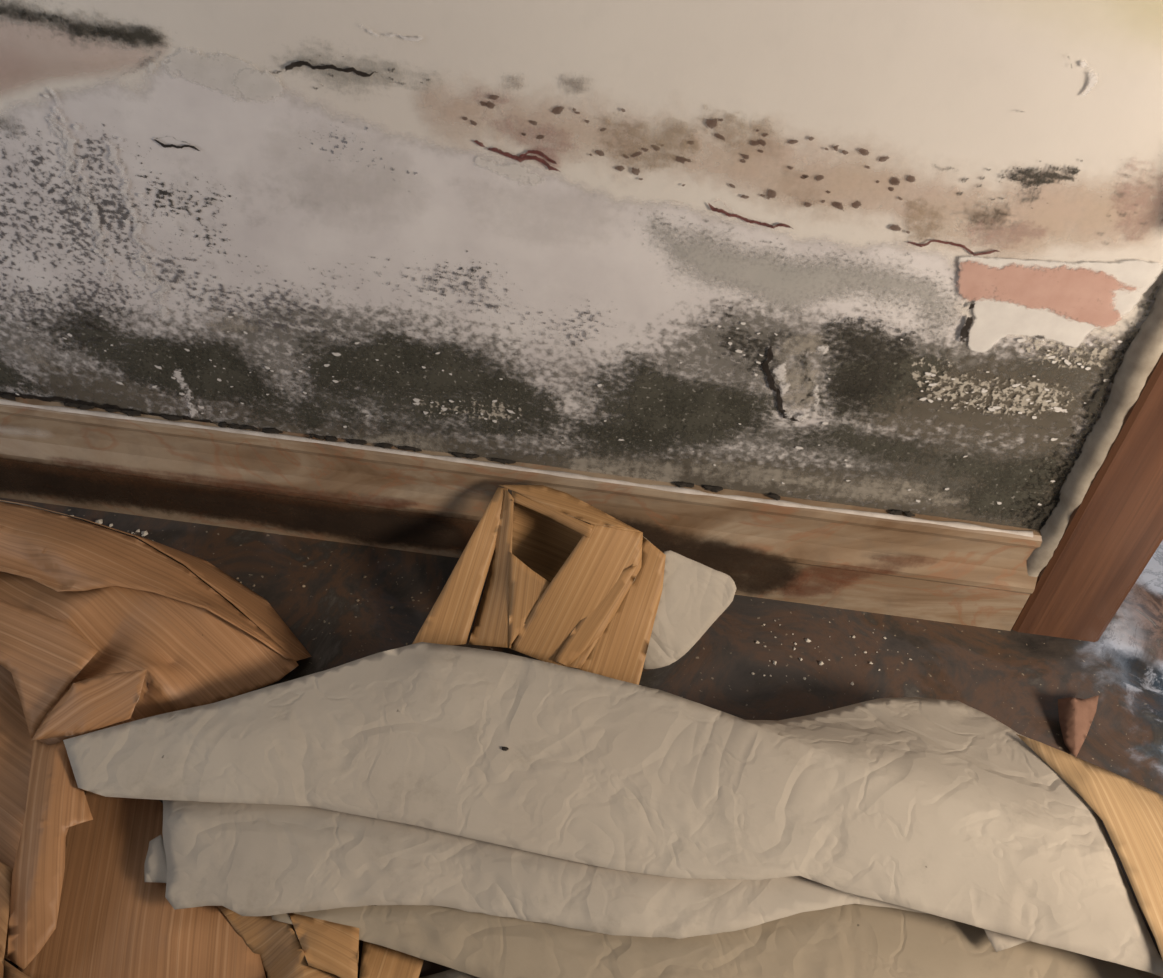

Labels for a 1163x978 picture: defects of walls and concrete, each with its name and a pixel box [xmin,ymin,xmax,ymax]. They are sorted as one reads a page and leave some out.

crack [273,61,430,89]
leakage [428,94,499,125]
leakage [0,106,1153,530]
peeling [0,48,1163,520]
leakage [0,457,479,552]
leakage [614,517,799,594]